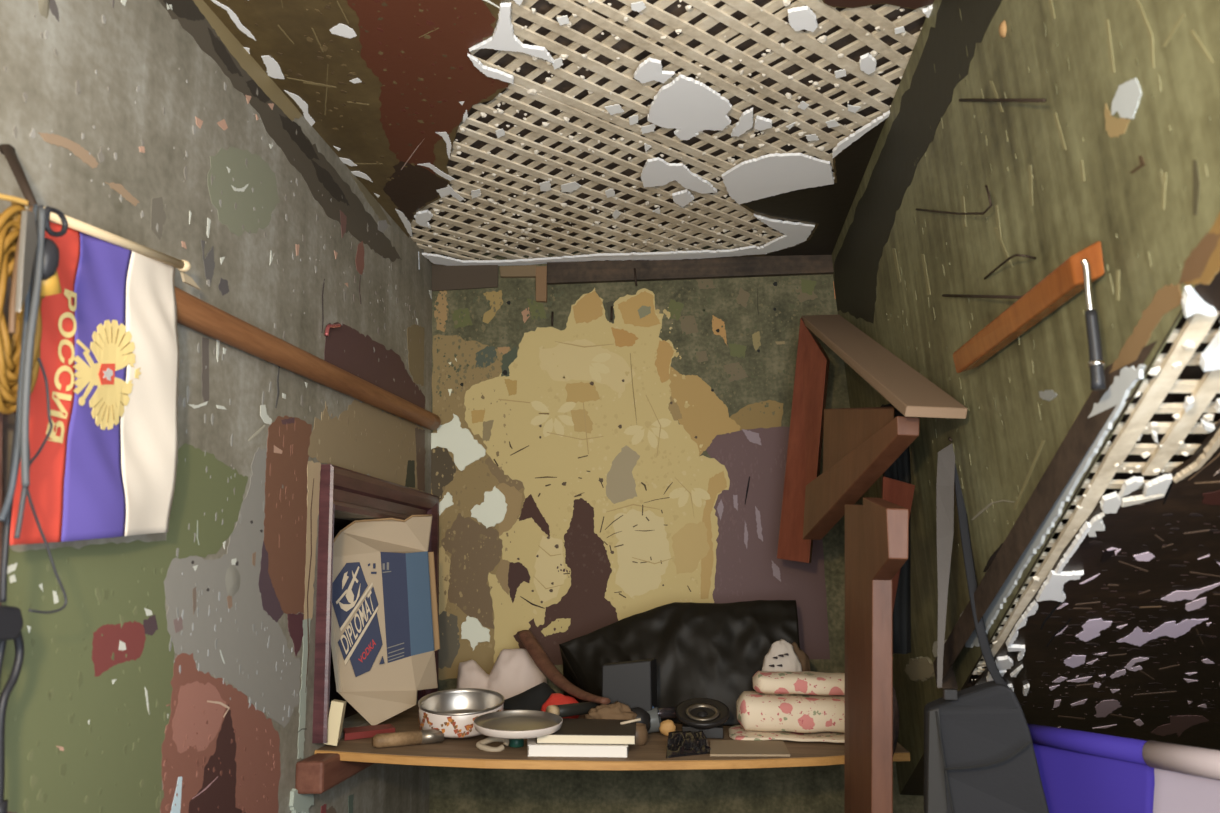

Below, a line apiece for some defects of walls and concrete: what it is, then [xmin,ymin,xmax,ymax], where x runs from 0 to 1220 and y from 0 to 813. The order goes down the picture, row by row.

peeling [330,0,926,252]
peeling [1111,78,1142,119]
spalling [904,213,1220,689]
peeling [260,318,525,759]
peeling [92,608,153,684]
peeling [160,653,314,813]
peeling [1049,582,1220,728]